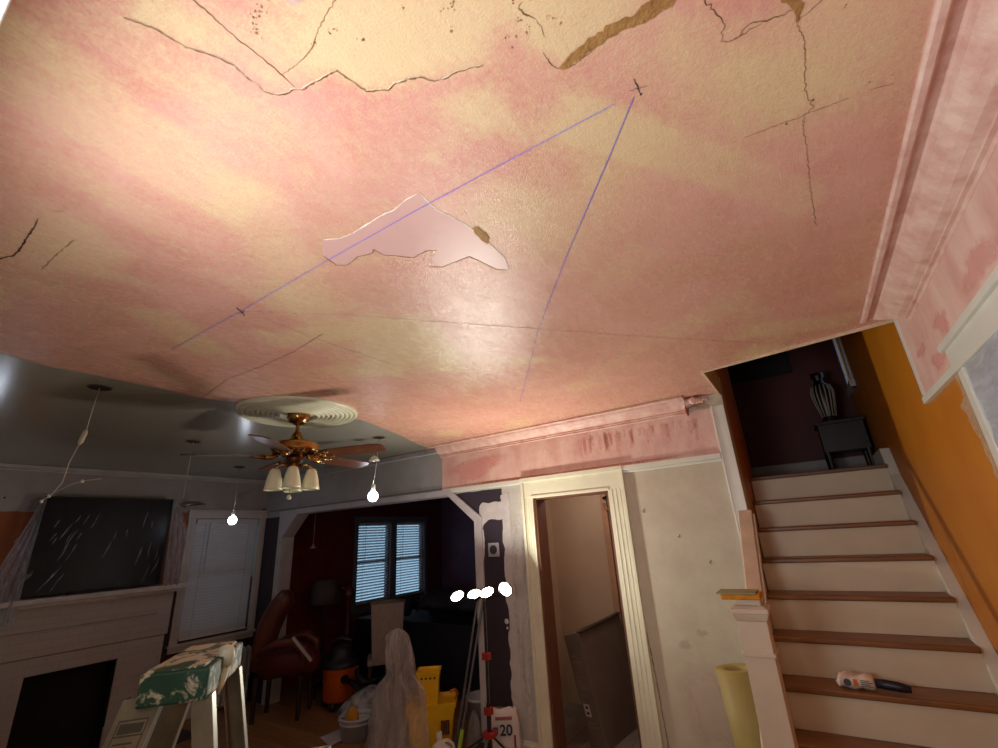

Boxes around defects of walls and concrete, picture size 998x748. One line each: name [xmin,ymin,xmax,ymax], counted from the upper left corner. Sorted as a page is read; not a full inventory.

crack [124,0,484,96]
crack [504,0,562,69]
flaking render [721,0,822,226]
crack [744,98,849,138]
crack [0,210,63,260]
peeling [322,193,510,270]